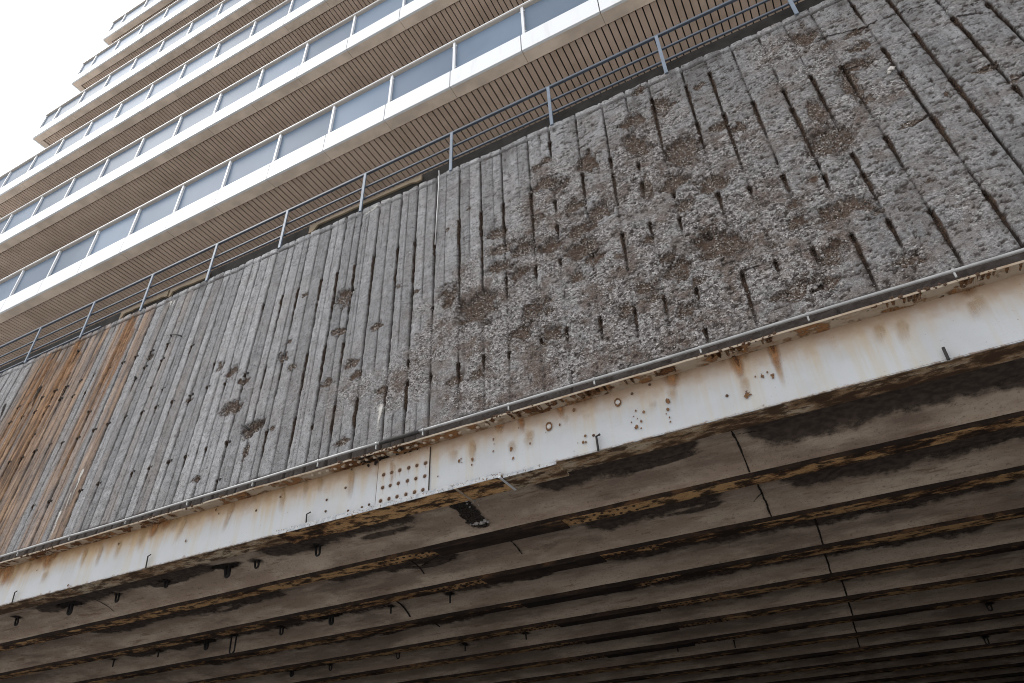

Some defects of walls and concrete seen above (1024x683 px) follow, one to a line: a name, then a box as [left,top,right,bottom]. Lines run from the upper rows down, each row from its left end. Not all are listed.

corrosion [702,319,834,379]
corrosion [327,366,677,473]
water stain [746,358,1024,446]
water stain [536,440,698,491]
crack [731,431,772,517]
water stain [257,516,415,556]
spalling [449,500,490,528]
water stain [585,492,723,531]
water stain [609,479,1016,560]
water stain [36,564,215,613]
water stain [92,591,286,633]
crack [814,519,860,648]